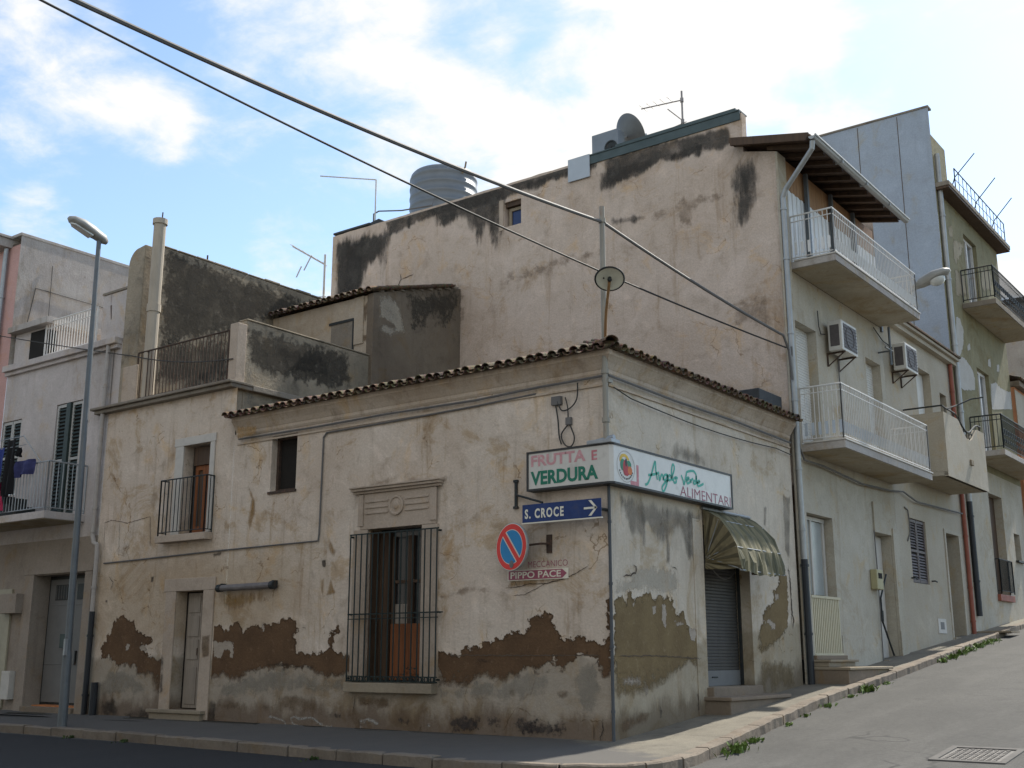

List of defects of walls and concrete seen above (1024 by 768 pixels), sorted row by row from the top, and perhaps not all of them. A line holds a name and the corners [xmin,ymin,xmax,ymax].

water stain [590,128,730,190]
water stain [733,162,755,224]
water stain [336,168,568,294]
water stain [157,251,350,389]
water stain [407,289,458,330]
flaking render [100,615,161,690]
flaking render [211,617,350,679]
flaking render [438,591,697,695]
flaking render [758,569,789,653]